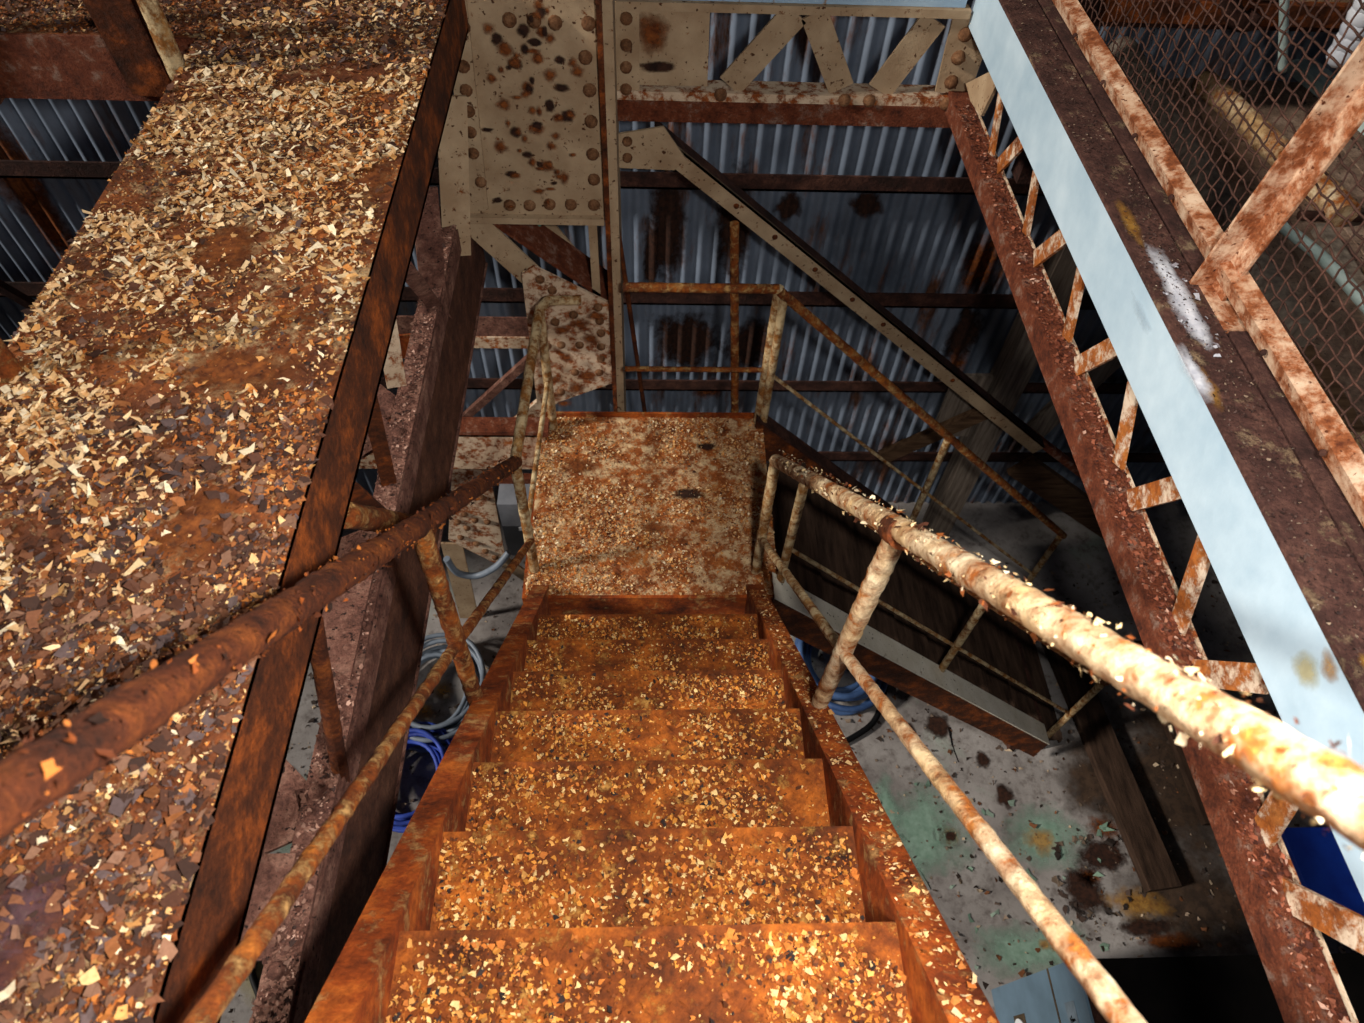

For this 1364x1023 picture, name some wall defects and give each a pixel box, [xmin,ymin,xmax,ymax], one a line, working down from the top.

rust [483,0,583,205]
rust [0,178,73,253]
rust [0,293,95,425]
rust [70,0,446,517]
rust [546,312,604,343]
rust [656,312,768,367]
rust [943,237,998,369]
rust [38,436,168,599]
rust [147,543,286,672]
rust [525,354,997,1023]
rust [1298,658,1334,680]
rust [50,908,155,1023]